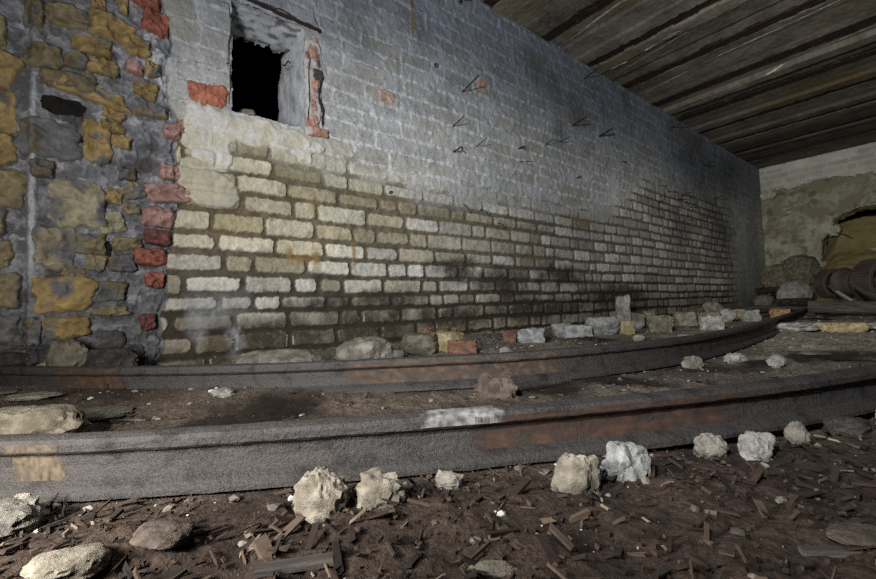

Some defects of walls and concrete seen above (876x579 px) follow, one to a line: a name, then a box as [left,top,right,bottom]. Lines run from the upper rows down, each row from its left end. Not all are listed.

spalling [187,80,228,109]
peeling [311,79,329,139]
spalling [821,204,876,262]